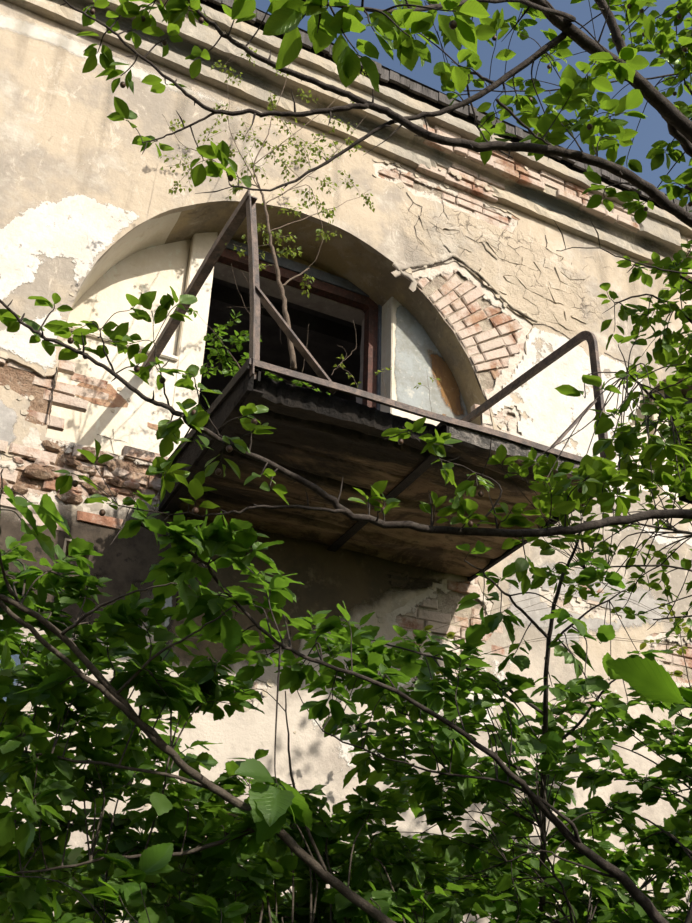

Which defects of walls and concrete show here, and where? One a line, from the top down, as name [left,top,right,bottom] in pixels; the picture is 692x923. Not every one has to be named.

crack [391,192,605,347]
peeling [372,124,647,471]
spalling [0,310,169,530]
spalling [645,632,692,688]